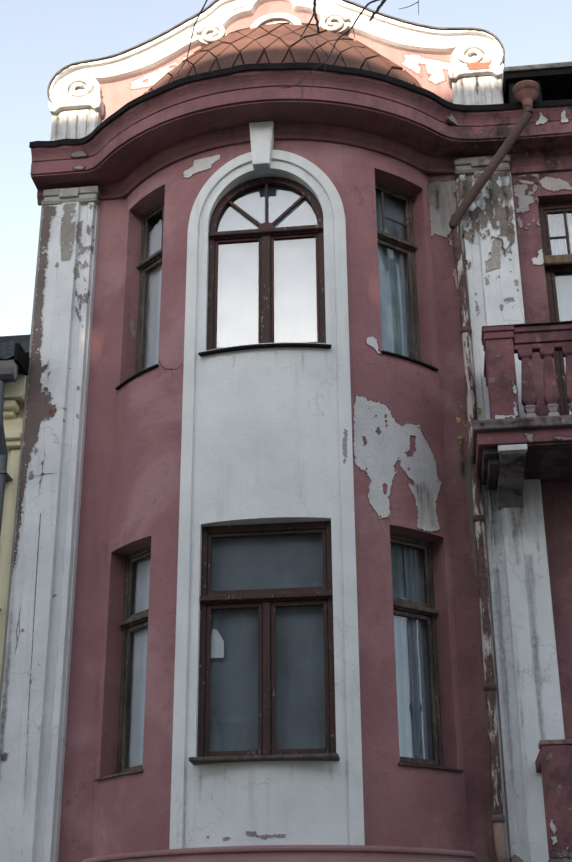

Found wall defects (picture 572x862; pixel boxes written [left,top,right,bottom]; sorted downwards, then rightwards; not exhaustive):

peeling [130,53,191,90]
peeling [400,53,449,85]
peeling [534,110,570,127]
peeling [182,154,222,179]
peeling [427,171,572,311]
peeling [12,203,95,573]
peeling [342,394,443,533]
peeling [548,818,572,859]